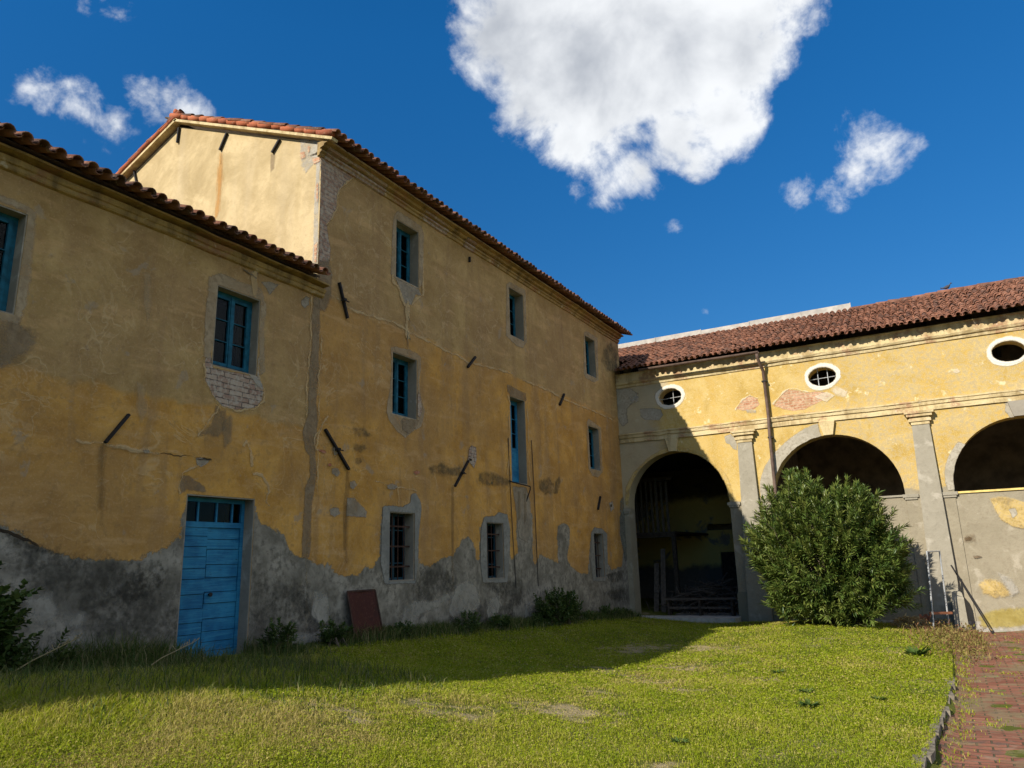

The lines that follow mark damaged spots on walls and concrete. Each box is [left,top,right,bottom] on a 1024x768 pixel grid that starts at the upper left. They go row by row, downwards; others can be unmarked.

flaking render [300,139,388,311]
flaking render [203,273,278,412]
peeling [0,508,186,661]
crack [76,440,199,458]
peeling [243,440,732,649]
peeling [760,388,847,502]
peeling [980,575,1018,597]
peeling [992,497,1024,528]